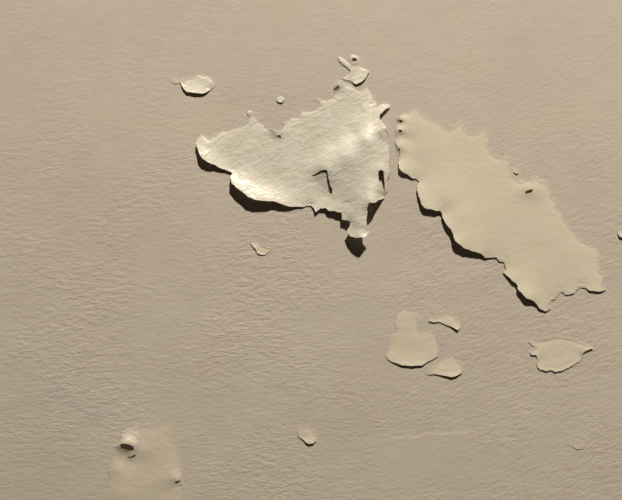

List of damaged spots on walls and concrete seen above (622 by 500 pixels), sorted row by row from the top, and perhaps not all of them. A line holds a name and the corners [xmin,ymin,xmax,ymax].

peeling [180,71,216,93]
peeling [196,55,605,311]
peeling [385,308,463,377]
peeling [529,337,593,372]